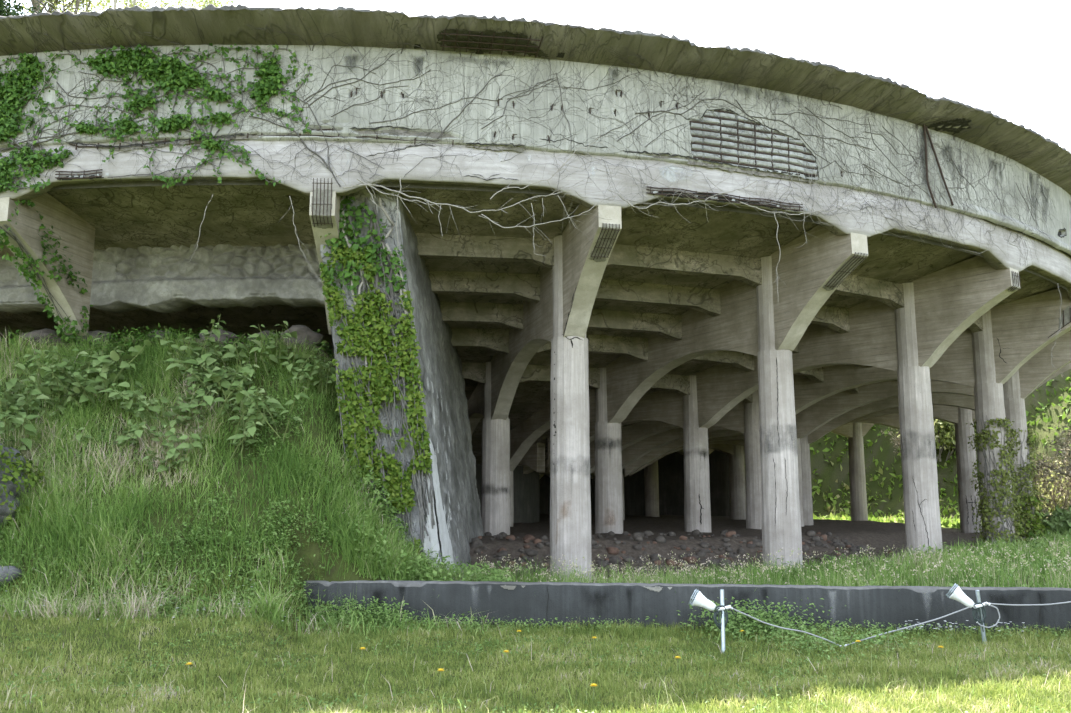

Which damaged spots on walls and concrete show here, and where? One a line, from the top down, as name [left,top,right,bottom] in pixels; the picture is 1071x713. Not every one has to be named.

spalling [624,108,819,183]
spalling [310,178,333,229]
spalling [588,223,620,262]